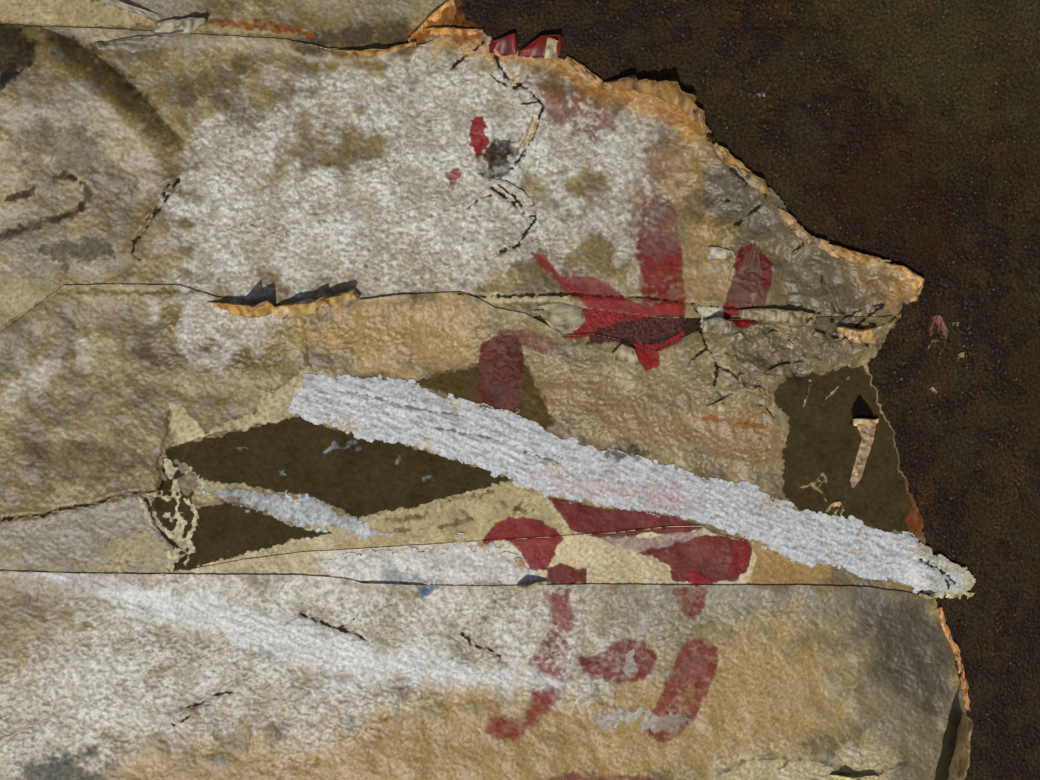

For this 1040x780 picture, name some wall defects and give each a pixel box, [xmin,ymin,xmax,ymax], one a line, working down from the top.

peeling [0,0,298,53]
peeling [318,0,770,207]
peeling [777,207,925,302]
peeling [208,288,361,320]
peeling [472,291,586,335]
peeling [697,306,817,335]
peeling [837,313,902,344]
peeling [0,362,571,577]
peeling [750,366,913,532]
rust [905,481,924,538]
peeling [919,592,975,780]
peeling [591,706,691,733]